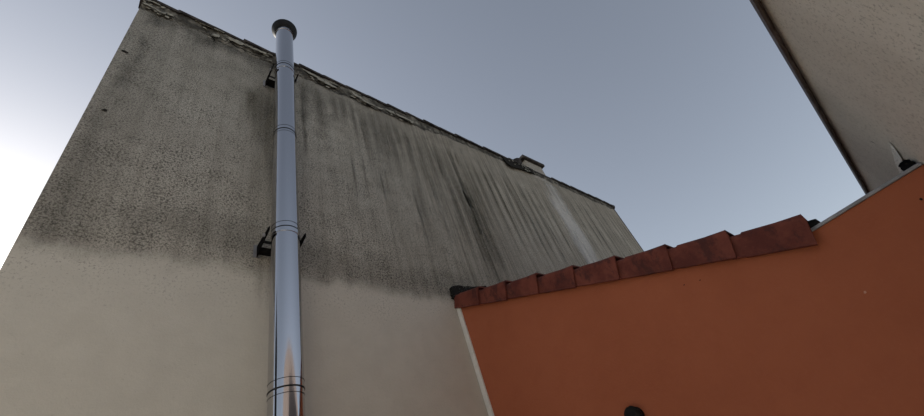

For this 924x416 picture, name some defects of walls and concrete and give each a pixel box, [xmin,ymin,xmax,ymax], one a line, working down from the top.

water stain [549,184,598,264]